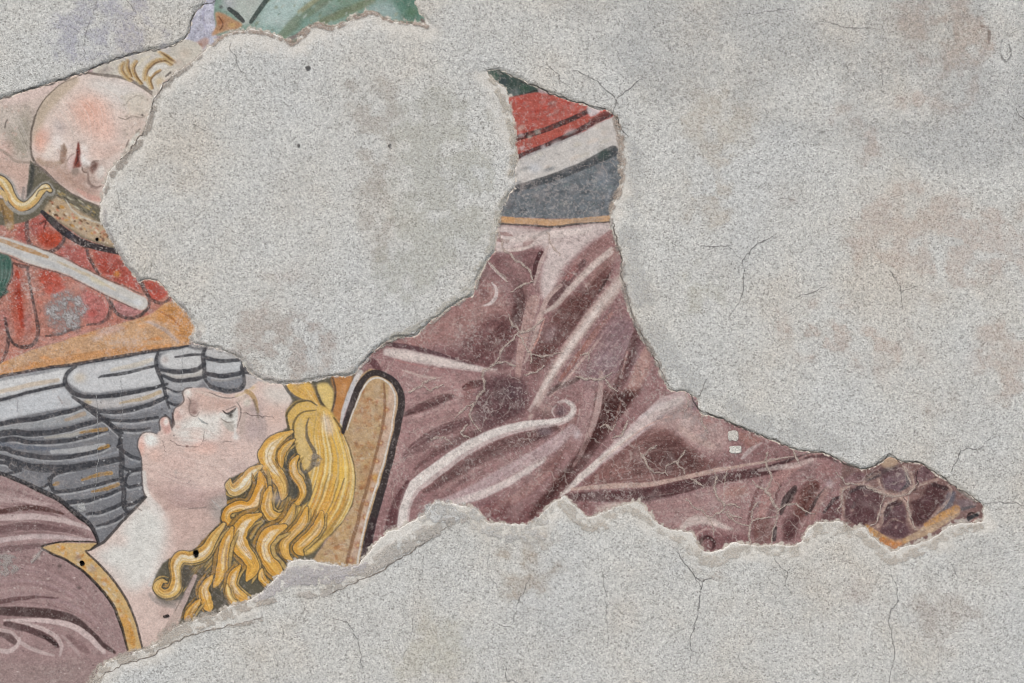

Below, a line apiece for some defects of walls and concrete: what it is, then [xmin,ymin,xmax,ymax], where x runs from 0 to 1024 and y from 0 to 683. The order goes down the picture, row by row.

spalling [212,11,429,46]
spalling [104,106,155,194]
crack [497,62,635,134]
spalling [189,193,507,384]
crack [433,231,618,444]
crack [600,225,990,545]
peeling [728,430,741,453]
spalling [86,500,983,683]
crack [679,554,711,666]